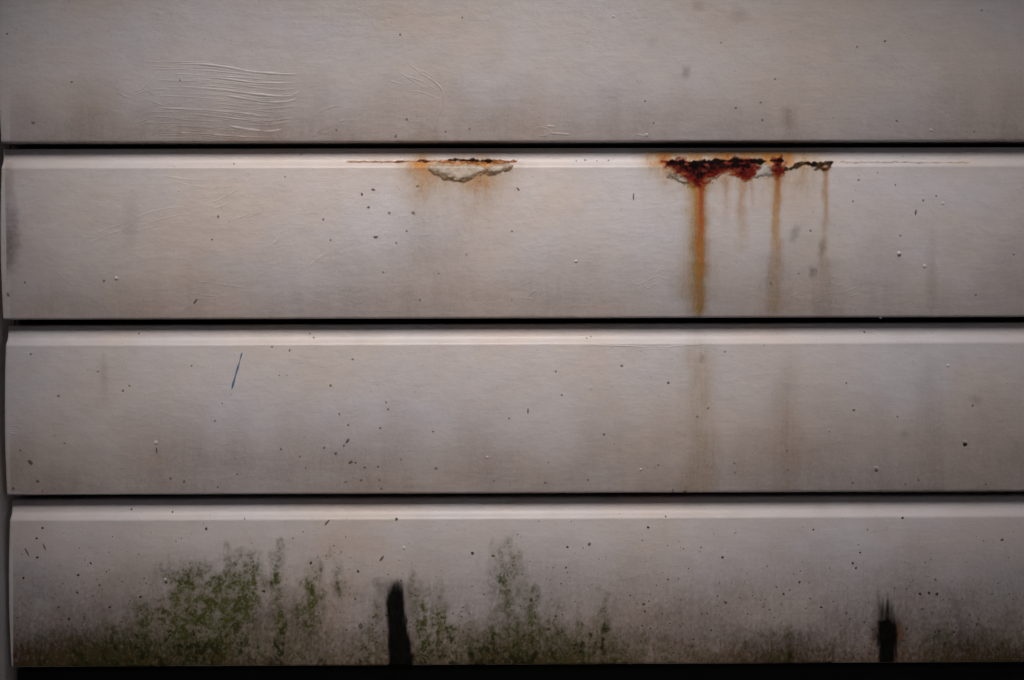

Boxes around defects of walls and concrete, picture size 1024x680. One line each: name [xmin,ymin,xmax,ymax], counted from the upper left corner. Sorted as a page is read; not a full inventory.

rust [347,154,516,191]
peeling [428,163,513,182]
rust [647,151,857,313]
water stain [387,584,413,665]
water stain [873,601,903,662]